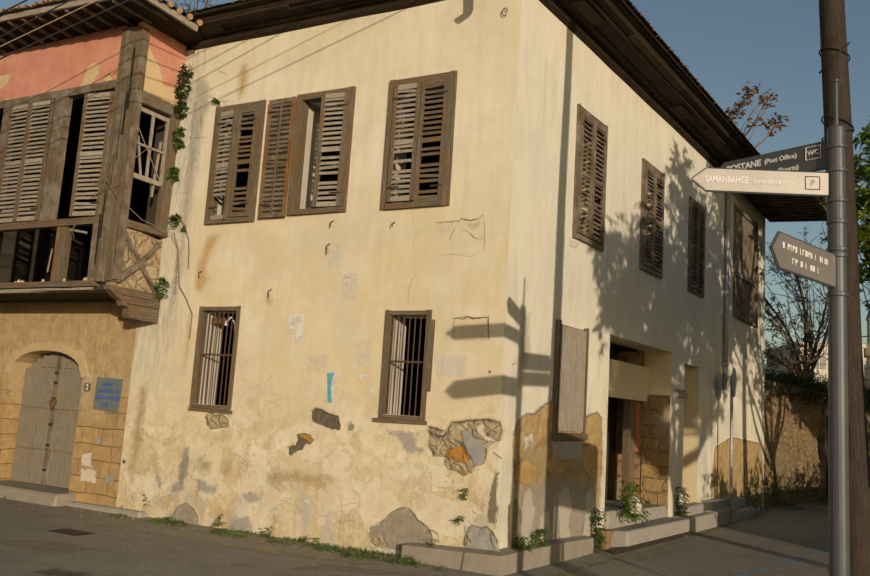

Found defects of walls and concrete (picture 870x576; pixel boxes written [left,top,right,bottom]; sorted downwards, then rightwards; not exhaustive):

peeling [80,62,117,86]
crack [411,215,485,257]
spalling [205,412,230,430]
spalling [288,432,315,456]
spalling [311,407,355,431]
spalling [389,400,603,476]
spalling [370,507,439,551]
spalling [463,504,500,552]